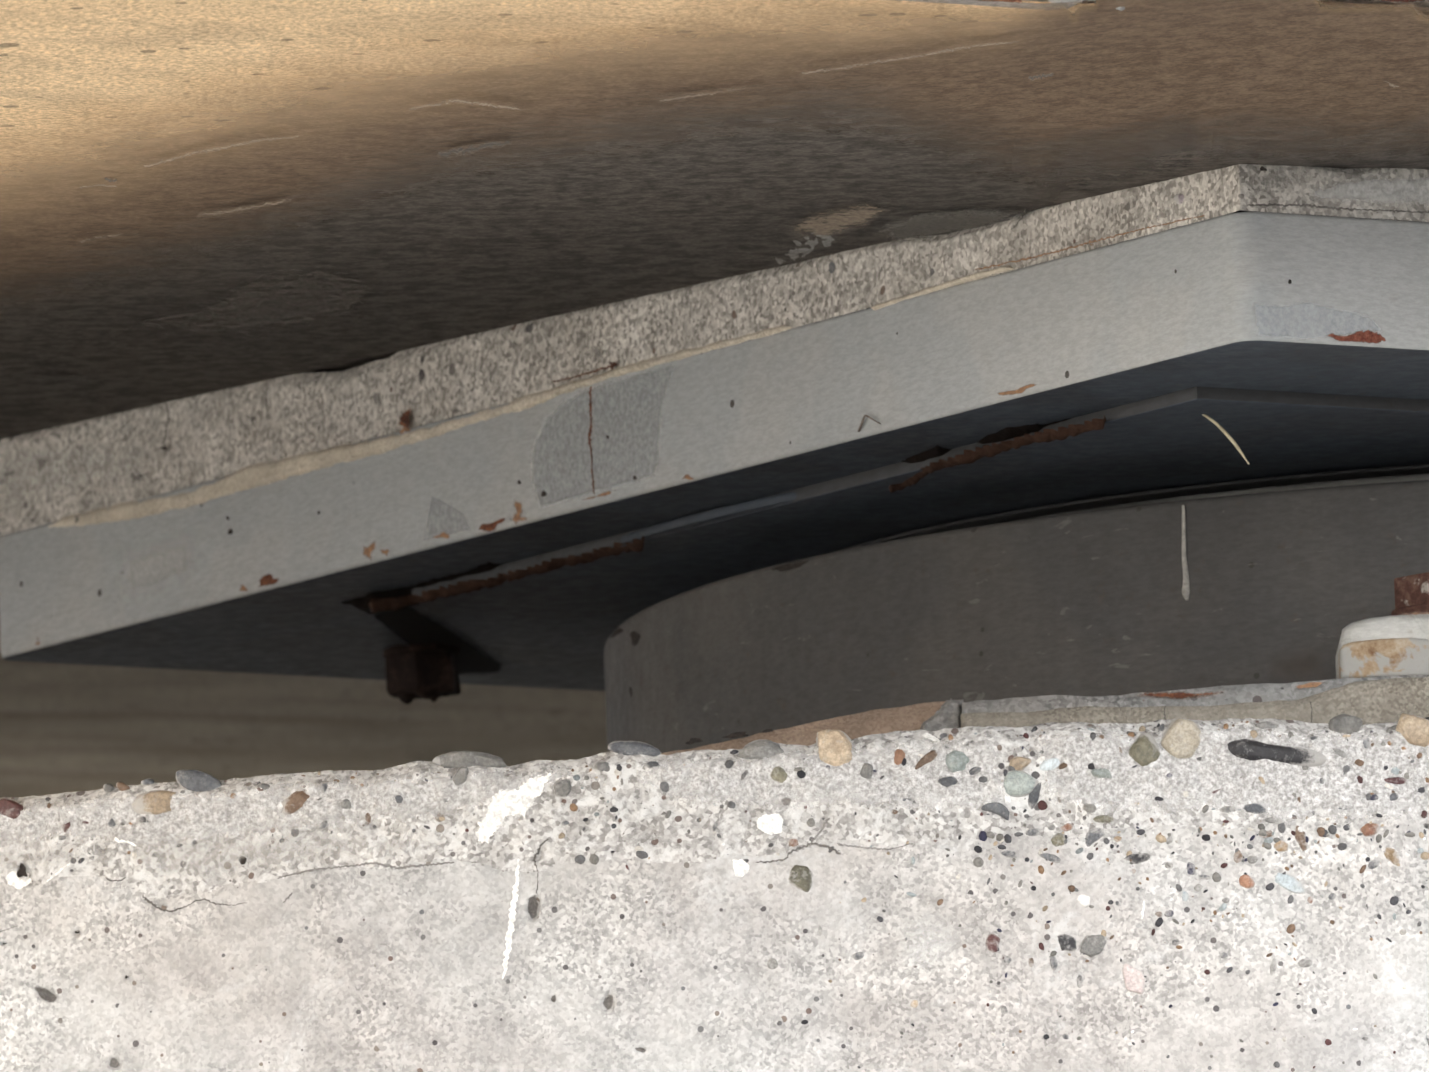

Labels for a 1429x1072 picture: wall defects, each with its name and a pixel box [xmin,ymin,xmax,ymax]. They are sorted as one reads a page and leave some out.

corrosion [1328,330,1386,343]
crack [106,877,242,912]
crack [278,862,454,903]